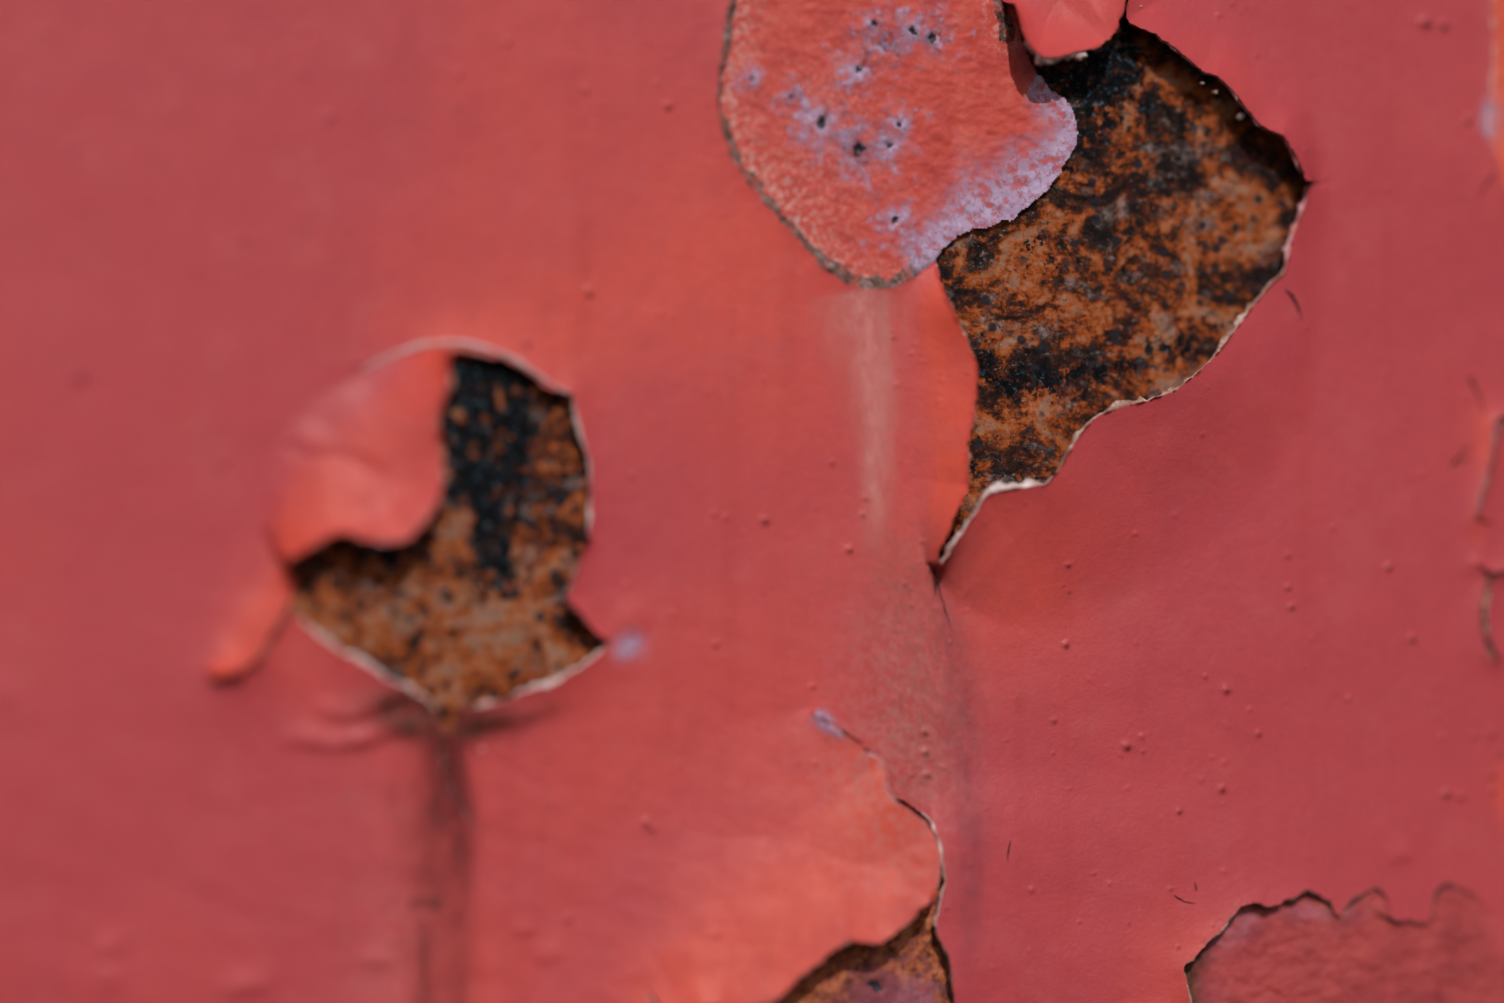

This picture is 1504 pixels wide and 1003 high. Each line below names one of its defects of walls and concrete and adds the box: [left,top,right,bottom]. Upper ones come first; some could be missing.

peeling [705,0,1332,574]
peeling [200,325,657,761]
peeling [521,701,968,1003]
peeling [1164,863,1504,1003]